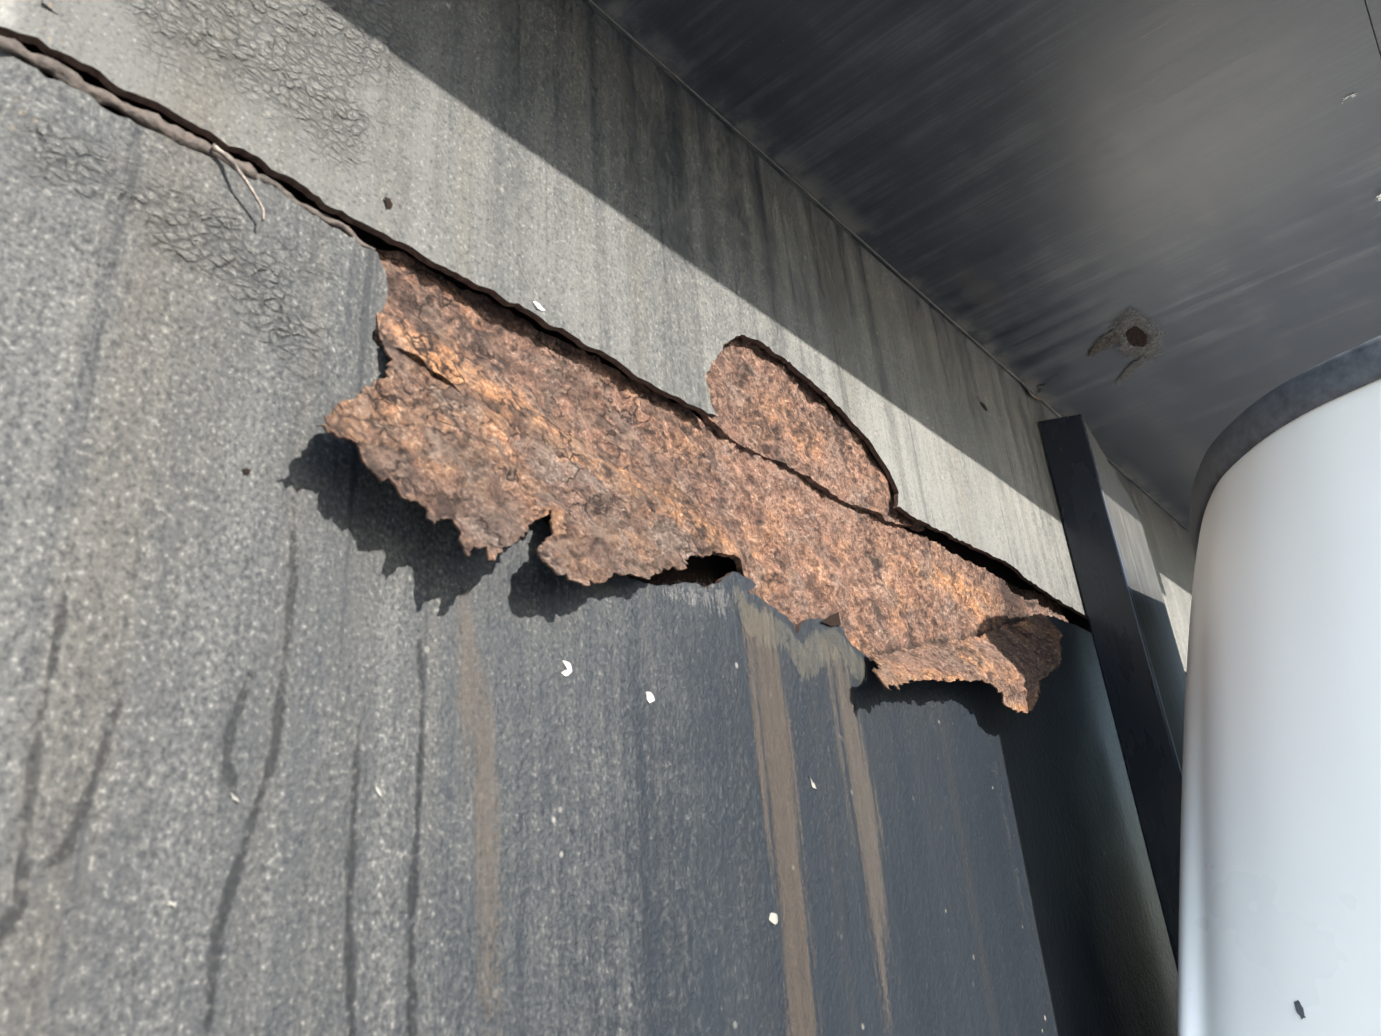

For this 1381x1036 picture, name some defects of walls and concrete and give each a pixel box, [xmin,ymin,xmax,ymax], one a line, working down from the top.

crack [0,35,704,421]
corrosion [316,244,1068,714]
crack [903,526,1091,633]
spalling [1126,326,1147,347]